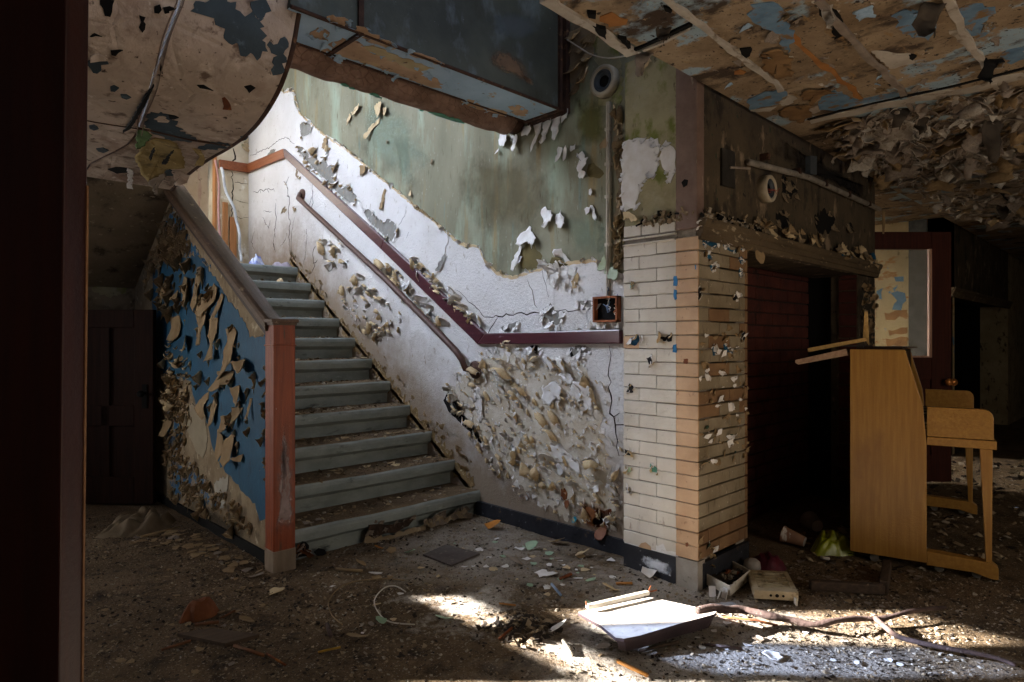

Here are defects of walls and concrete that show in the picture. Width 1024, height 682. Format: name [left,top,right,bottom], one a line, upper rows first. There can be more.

peeling [191,0,289,75]
peeling [144,112,250,153]
flaking render [281,15,676,331]
peeling [814,79,1024,232]
peeling [142,205,265,539]
peeling [290,237,480,390]
crack [457,270,584,333]
crack [608,346,624,455]
peeling [626,331,673,367]
peeling [699,324,751,466]
peeling [696,220,765,278]
peeling [756,174,907,346]